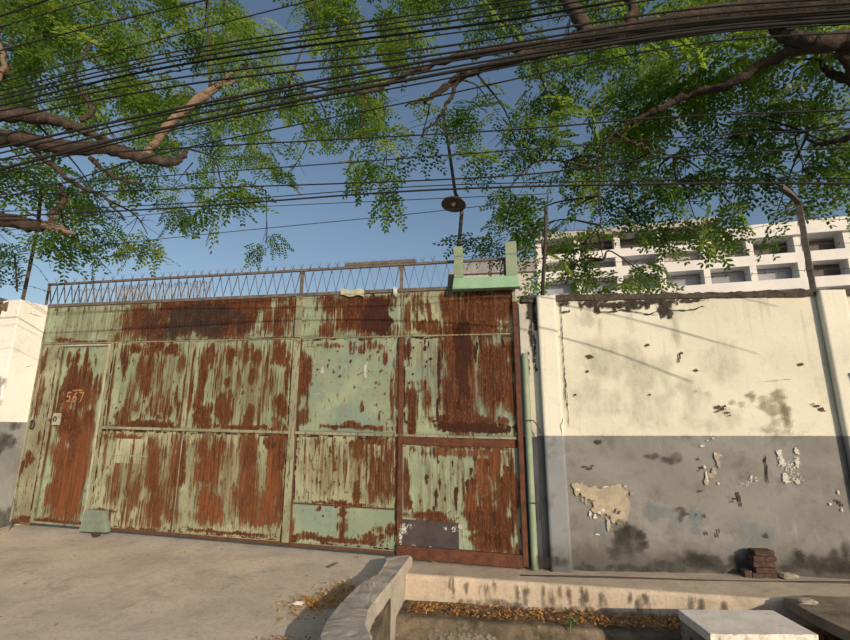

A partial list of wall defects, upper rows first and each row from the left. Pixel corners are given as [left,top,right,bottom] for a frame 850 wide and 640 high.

water stain [558,298,705,319]
rust [14,290,521,554]
water stain [747,391,791,422]
peeling [698,453,722,485]
peeling [776,448,803,484]
peeling [572,482,634,532]